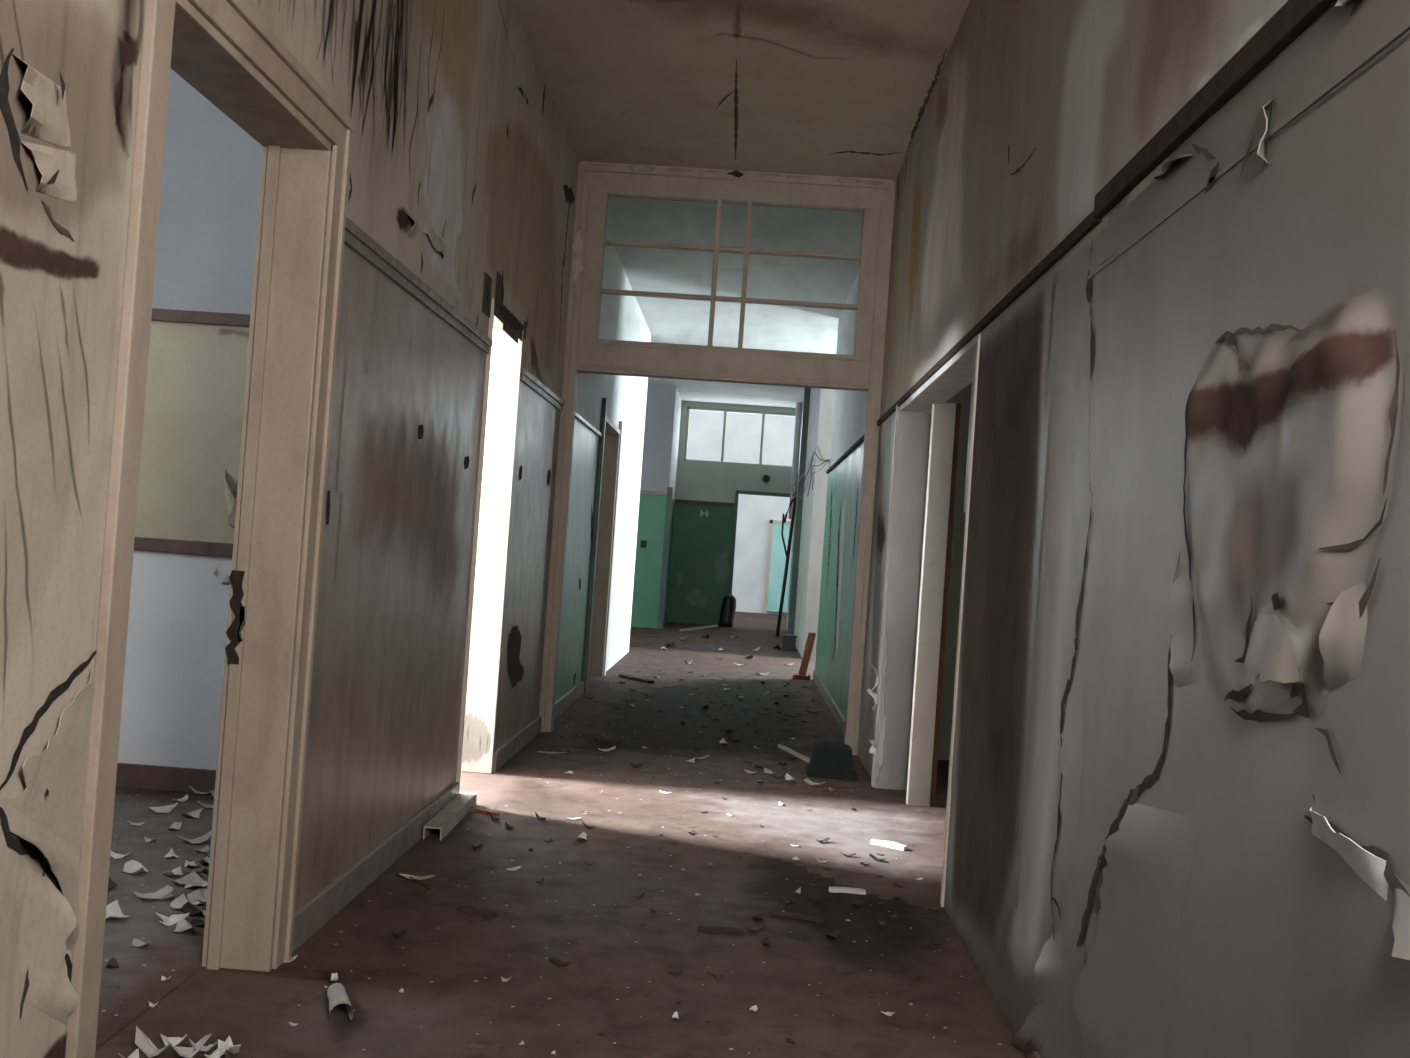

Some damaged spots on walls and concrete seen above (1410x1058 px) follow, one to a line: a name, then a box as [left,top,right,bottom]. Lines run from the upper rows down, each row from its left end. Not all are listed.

peeling [0,48,80,241]
crack [507,81,546,137]
crack [716,58,739,160]
peeling [1153,144,1219,194]
peeling [1240,94,1276,176]
spalling [214,561,246,665]
spalling [508,625,524,688]
peeling [1304,807,1410,960]